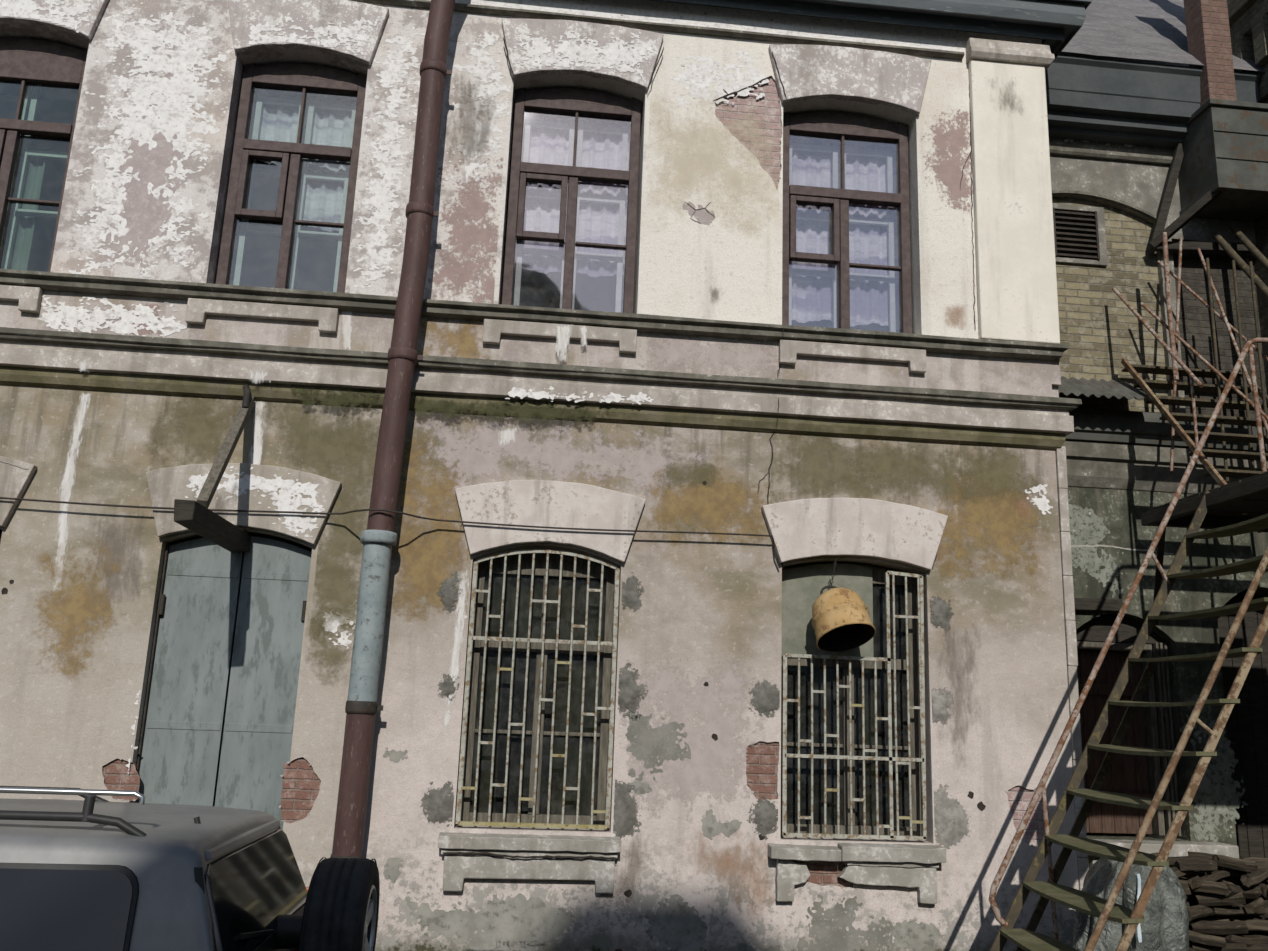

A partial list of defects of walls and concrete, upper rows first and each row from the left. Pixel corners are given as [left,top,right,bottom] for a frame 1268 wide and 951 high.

peeling [0,0,427,288]
peeling [427,0,973,304]
crack [960,63,976,329]
damp [39,393,135,674]
peeling [505,386,654,405]
damp [669,464,715,485]
crack [757,329,784,505]
spalling [103,690,140,802]
spalling [279,757,321,823]
damp [620,708,691,783]
peeling [619,659,780,840]
damp [796,895,901,951]